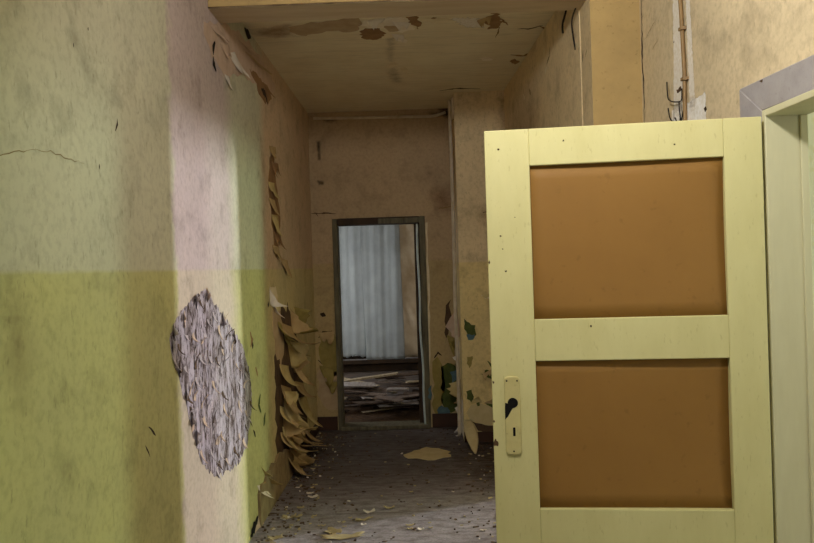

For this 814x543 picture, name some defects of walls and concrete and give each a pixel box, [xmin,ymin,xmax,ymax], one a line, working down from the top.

peeling [203,21,275,104]
peeling [360,16,422,43]
peeling [477,13,508,38]
crack [0,149,81,163]
peeling [425,222,493,436]
spalling [169,286,338,537]